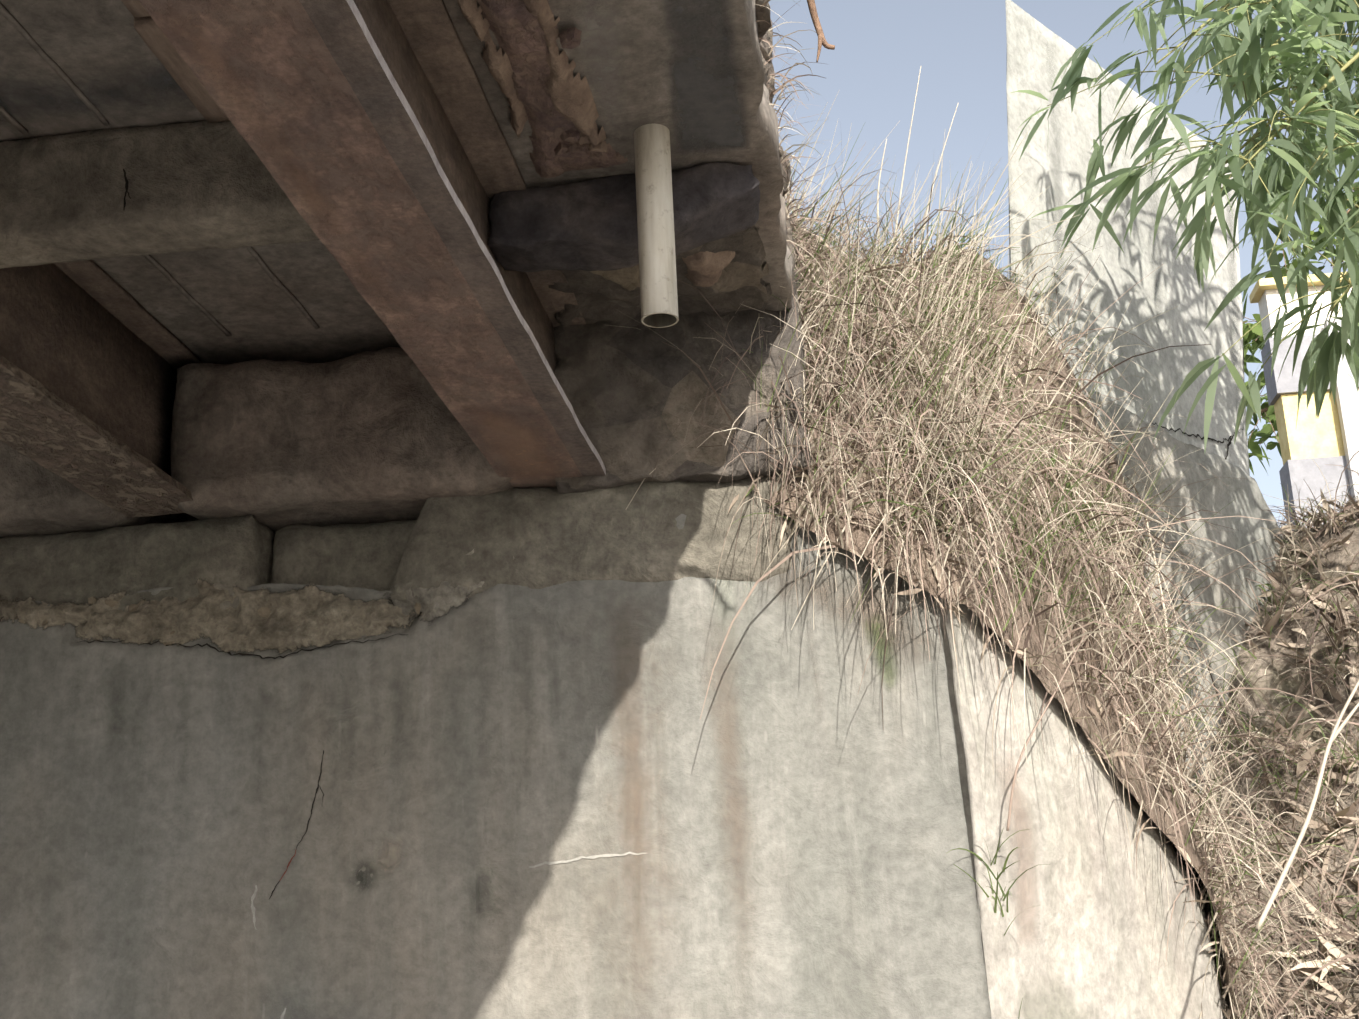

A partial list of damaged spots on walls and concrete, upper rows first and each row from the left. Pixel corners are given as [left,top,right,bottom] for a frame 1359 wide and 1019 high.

spalling [456,0,628,178]
crack [123,169,131,209]
crack [1150,421,1243,459]
spalling [0,578,484,659]
crack [269,750,324,899]